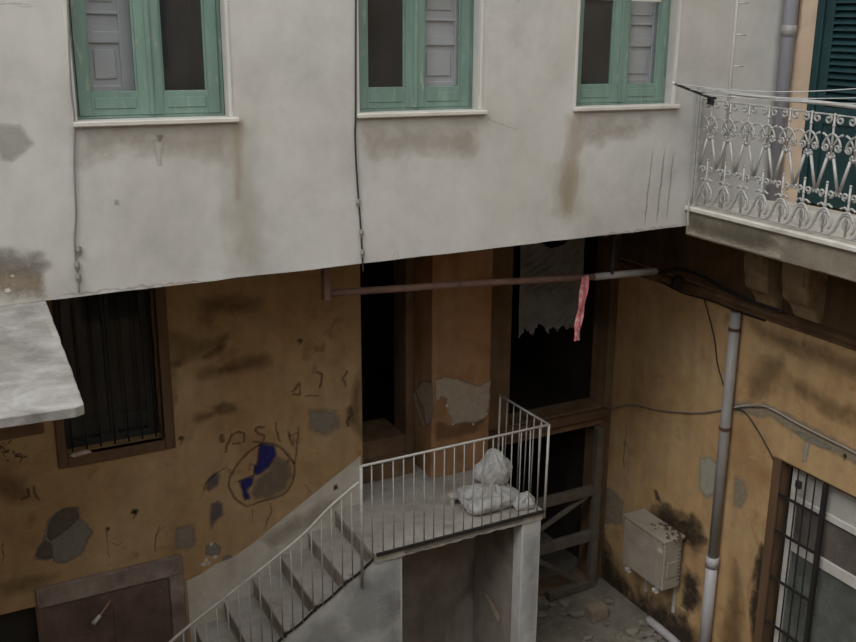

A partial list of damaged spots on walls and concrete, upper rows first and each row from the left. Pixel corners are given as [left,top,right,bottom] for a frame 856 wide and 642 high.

water stain [0,253,45,294]
peeling [413,377,490,428]
peeling [33,506,93,563]
water stain [653,491,707,547]